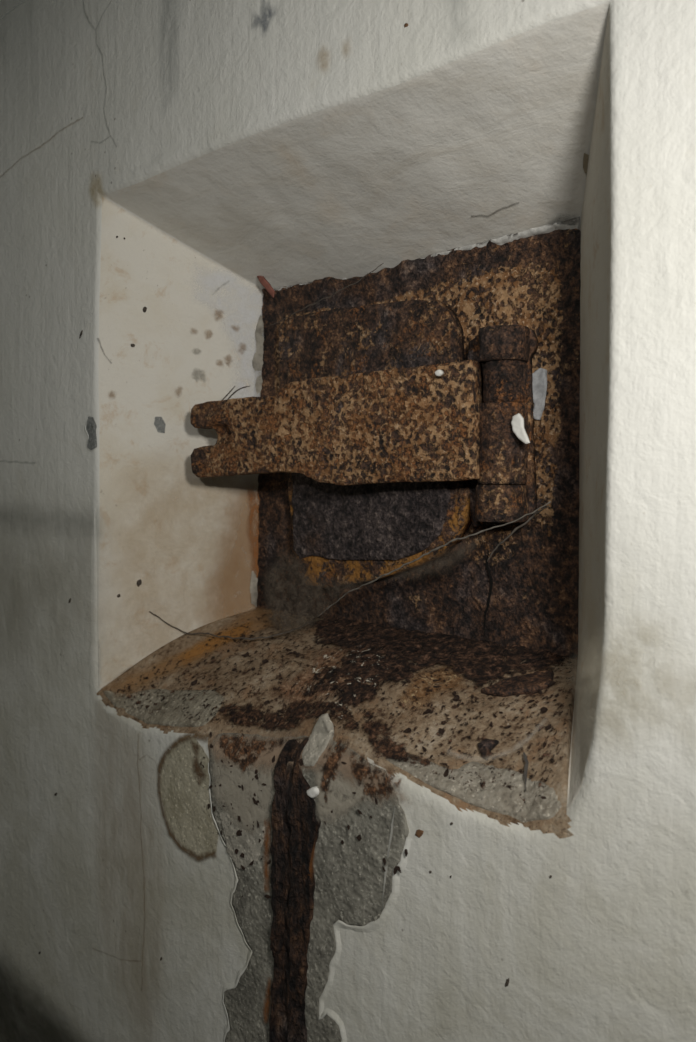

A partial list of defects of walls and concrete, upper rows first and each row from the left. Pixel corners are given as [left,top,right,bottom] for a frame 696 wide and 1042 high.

spalling [102,689,562,1042]
corrosion [220,617,577,767]